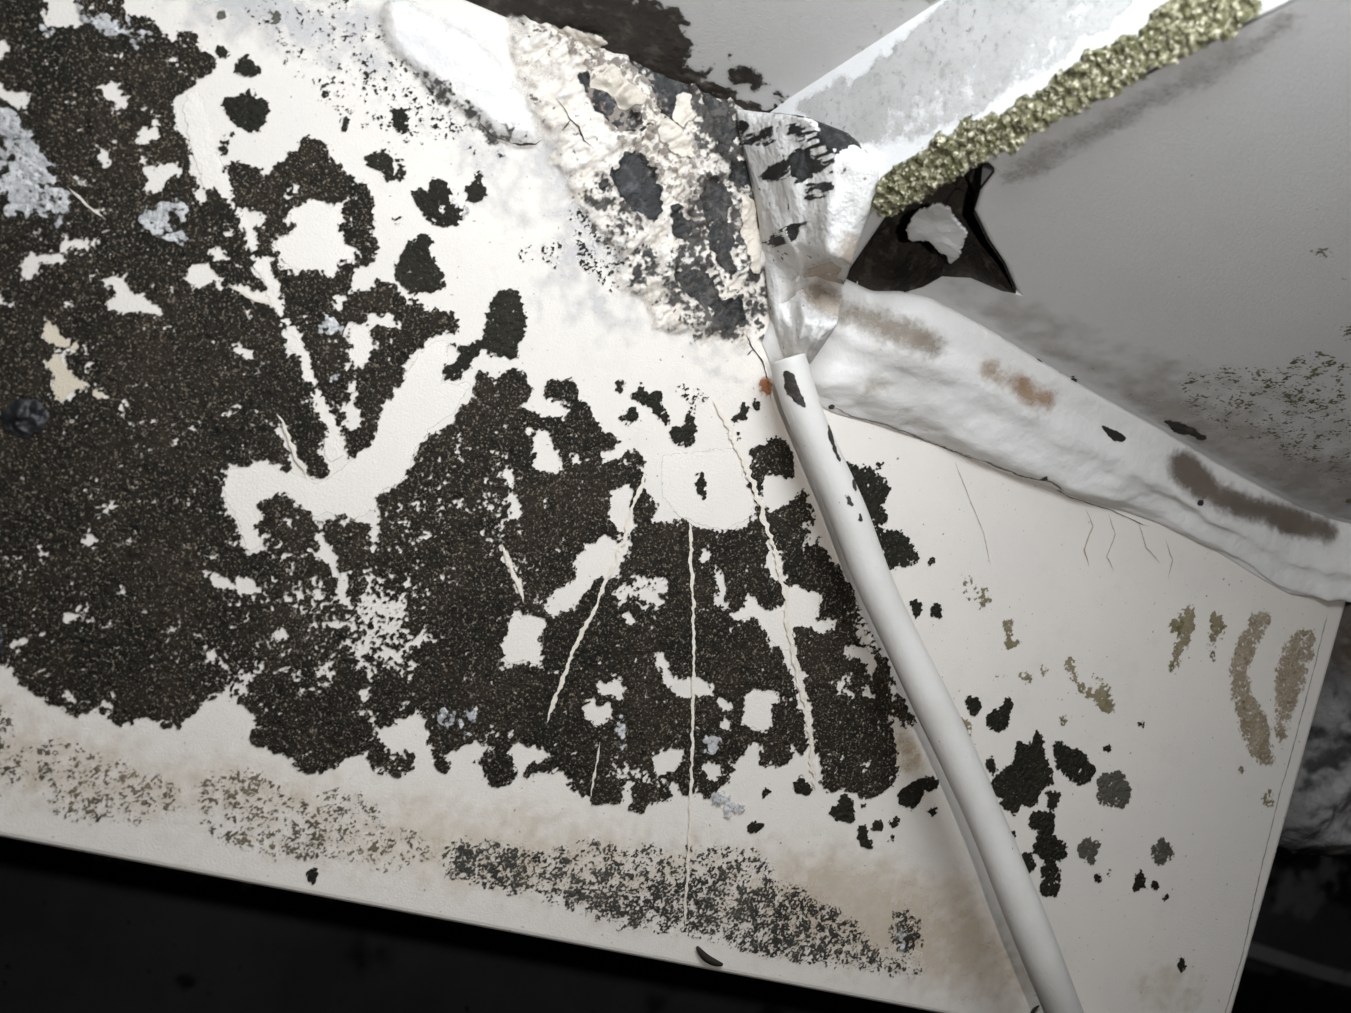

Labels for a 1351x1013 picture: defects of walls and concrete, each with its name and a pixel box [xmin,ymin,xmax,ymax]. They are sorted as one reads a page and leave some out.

spalling [509,17,768,347]
spalling [846,161,1016,293]
damp [0,0,943,978]
damp [965,695,1014,733]
damp [985,730,1132,898]
damp [1132,837,1175,901]